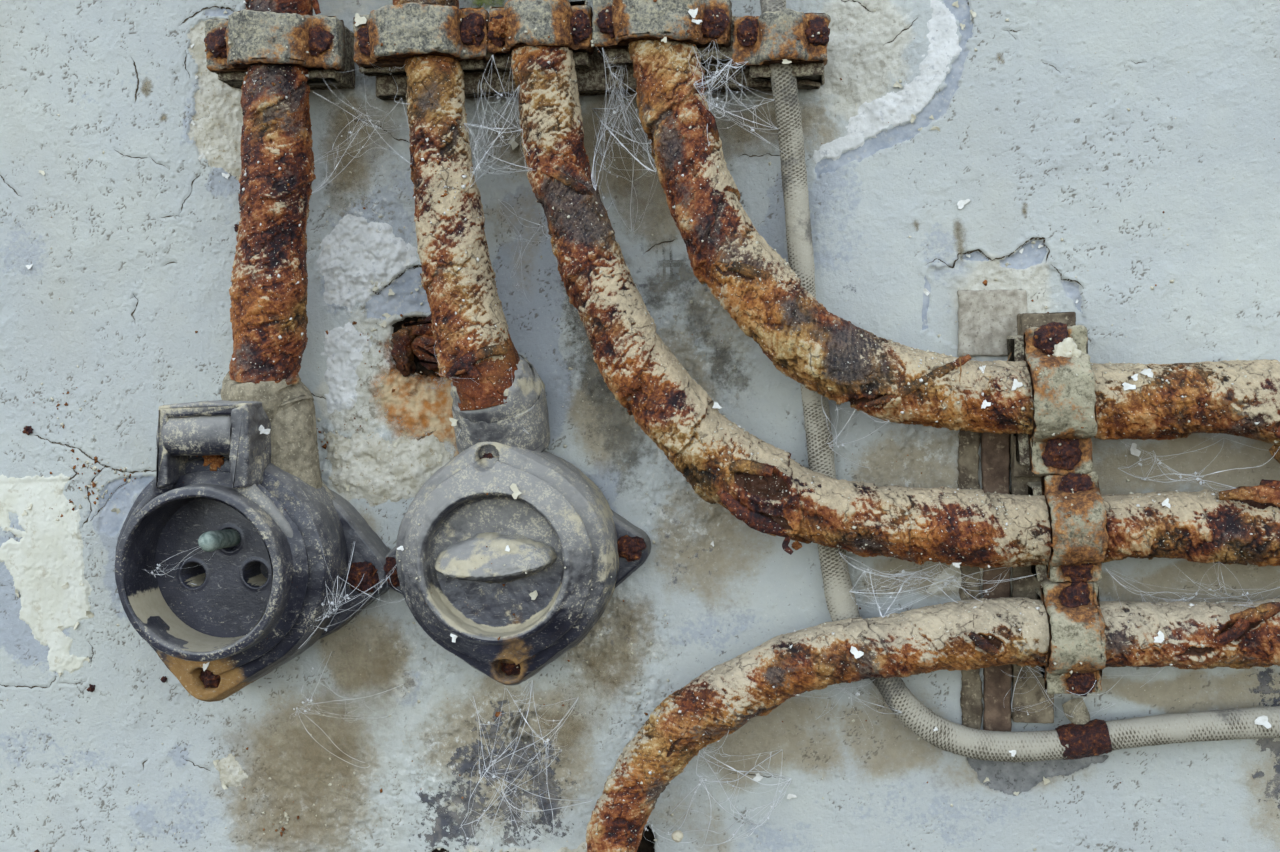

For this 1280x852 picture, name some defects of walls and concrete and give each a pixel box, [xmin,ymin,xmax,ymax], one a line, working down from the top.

spalling [187,8,246,180]
peeling [813,0,977,179]
spalling [922,275,931,330]
spalling [961,240,1047,270]
corrosion [373,342,459,456]
peeling [0,473,94,677]
water stain [1249,668,1280,707]
water stain [1252,738,1280,816]